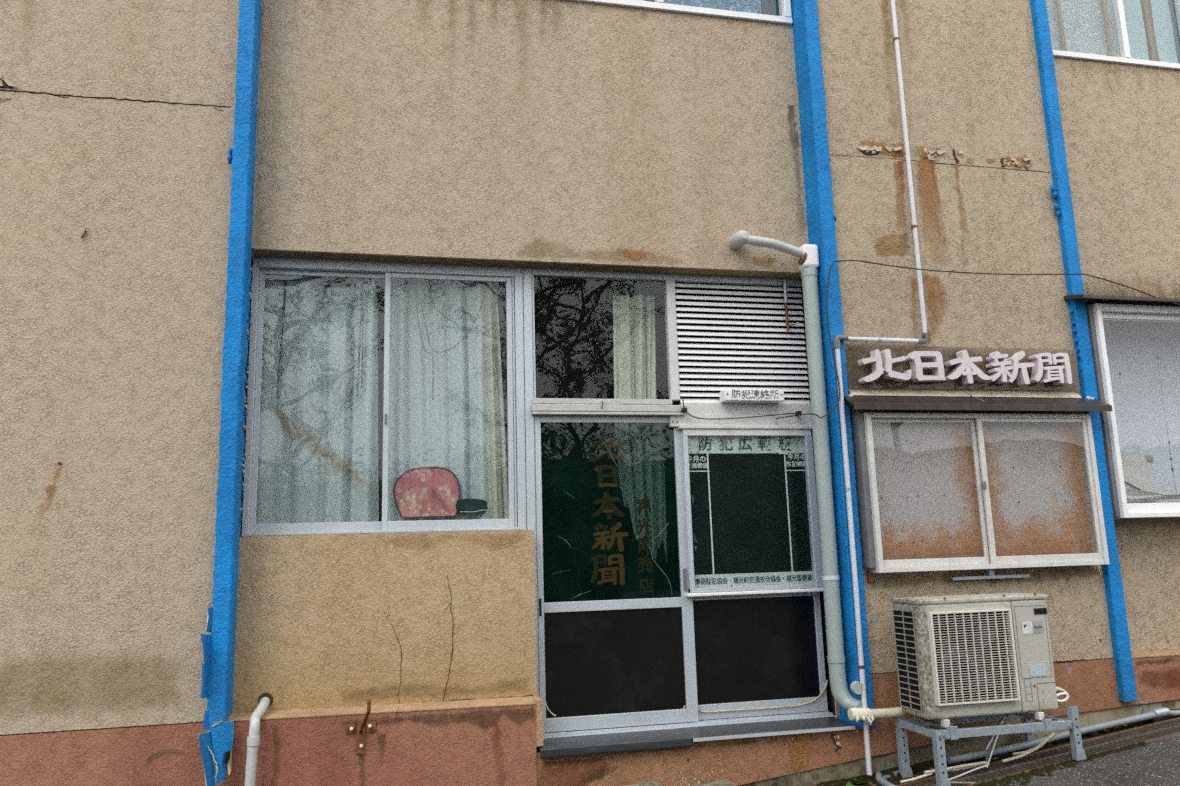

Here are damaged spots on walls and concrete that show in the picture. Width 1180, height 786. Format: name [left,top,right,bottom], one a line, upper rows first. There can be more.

flaking render [0,73,18,99]
crack [0,89,231,111]
flaking render [857,144,902,156]
corrosion [862,142,903,196]
corrosion [917,147,937,216]
flaking render [921,148,948,160]
flaking render [1000,154,1032,169]
crack [443,575,454,701]
peeling [198,607,234,786]
crack [387,617,403,722]